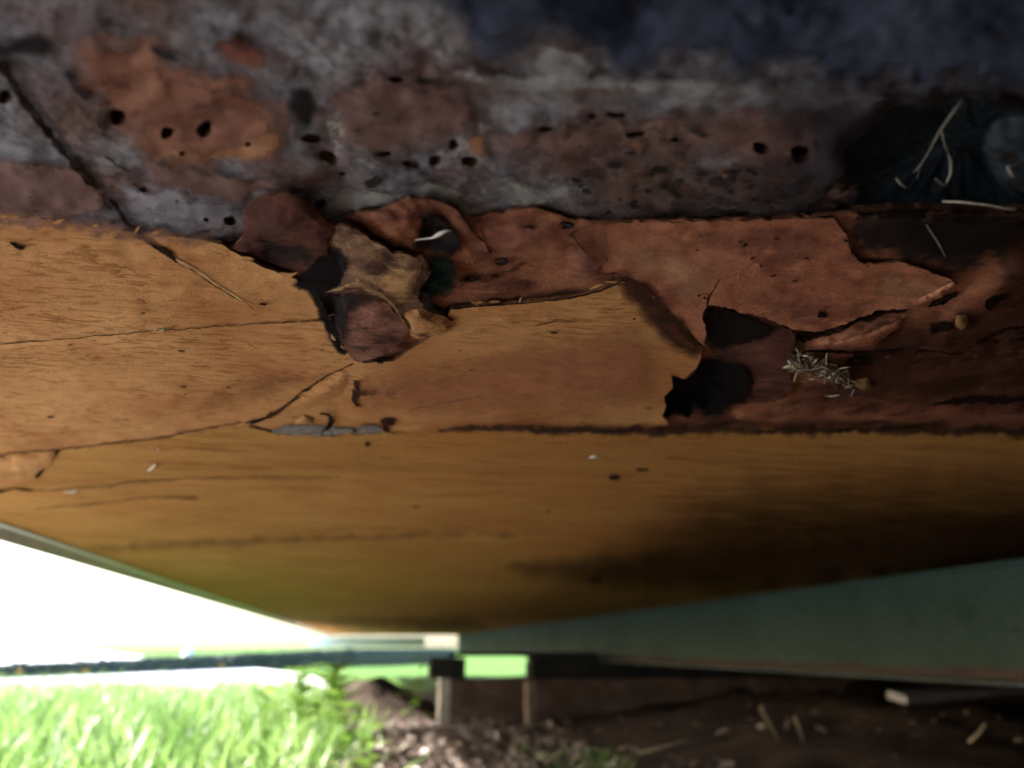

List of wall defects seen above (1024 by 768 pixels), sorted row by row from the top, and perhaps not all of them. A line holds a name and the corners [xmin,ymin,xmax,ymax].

water stain [0,35,53,58]
water stain [288,89,315,128]
water stain [444,0,1024,219]
water stain [327,110,346,155]
water stain [0,186,238,246]
water stain [327,182,467,214]
crack [0,359,383,510]
peeling [271,415,381,437]